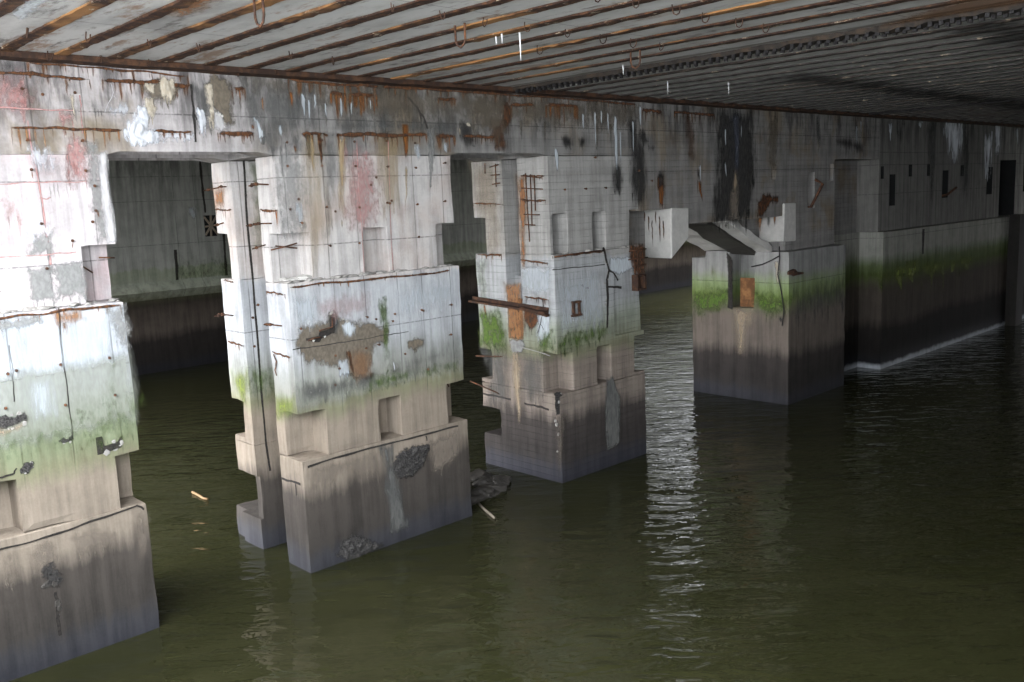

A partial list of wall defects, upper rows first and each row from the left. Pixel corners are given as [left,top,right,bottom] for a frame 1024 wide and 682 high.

corrosion [0,62,189,100]
leakage [119,76,214,147]
corrosion [11,126,121,147]
corrosion [303,132,322,162]
corrosion [337,124,496,156]
leakage [712,108,756,231]
corrosion [518,175,604,265]
corrosion [506,284,548,340]
peeling [296,311,389,378]
spalling [0,411,28,434]
spalling [96,436,124,456]
spalling [393,432,458,479]